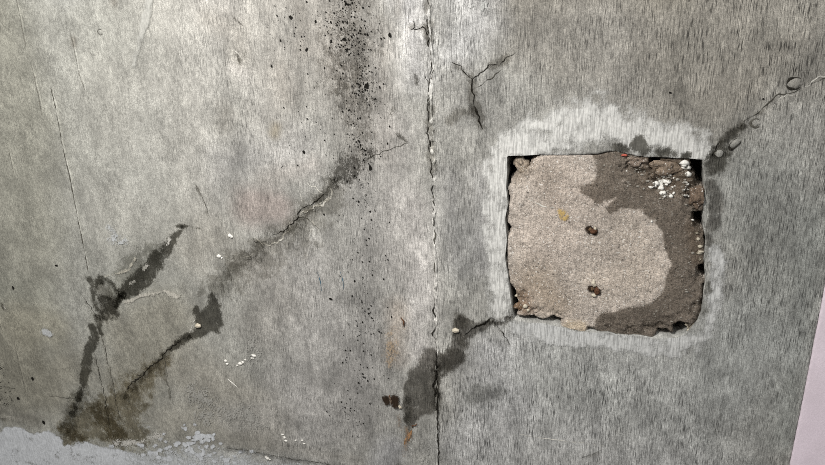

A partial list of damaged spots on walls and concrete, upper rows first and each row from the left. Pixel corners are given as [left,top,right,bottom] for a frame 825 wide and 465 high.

crack [451,54,513,128]
crack [742,76,825,124]
crack [243,182,333,260]
peeling [617,158,694,224]
water stain [70,224,188,418]
water stain [169,293,223,351]
corrosion [382,395,417,457]